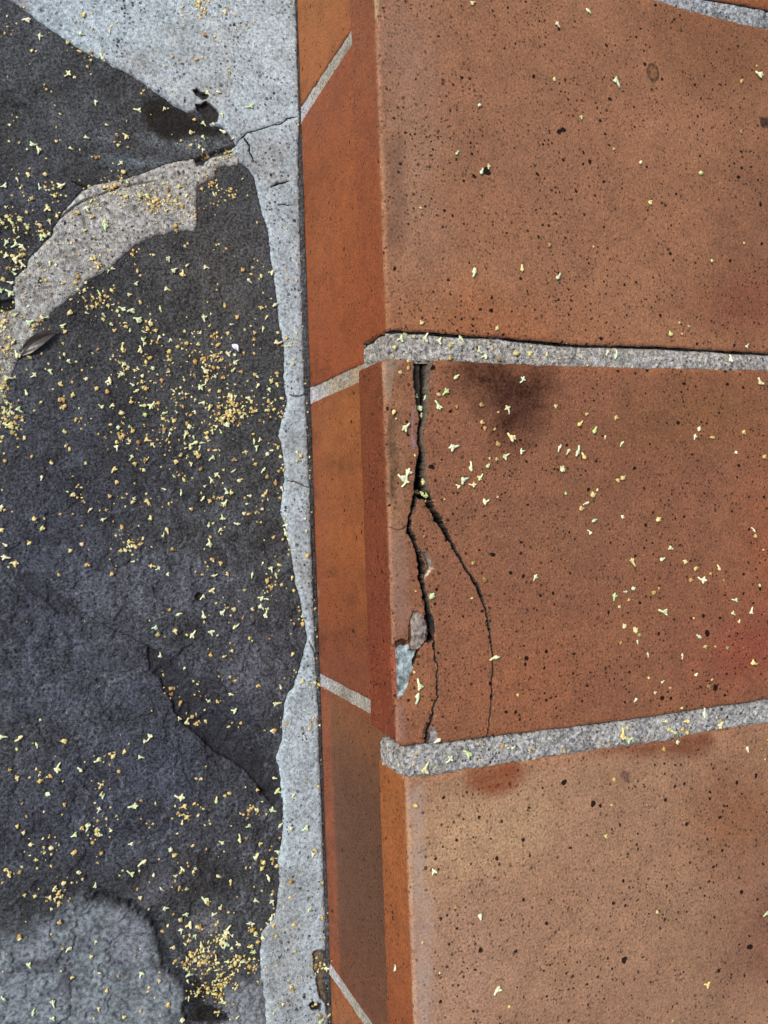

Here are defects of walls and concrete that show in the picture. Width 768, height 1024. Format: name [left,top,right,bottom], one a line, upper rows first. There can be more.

leakage [145,99,220,140]
crack [241,117,296,162]
leakage [468,364,544,433]
crack [386,360,494,743]
spalling [395,611,435,700]